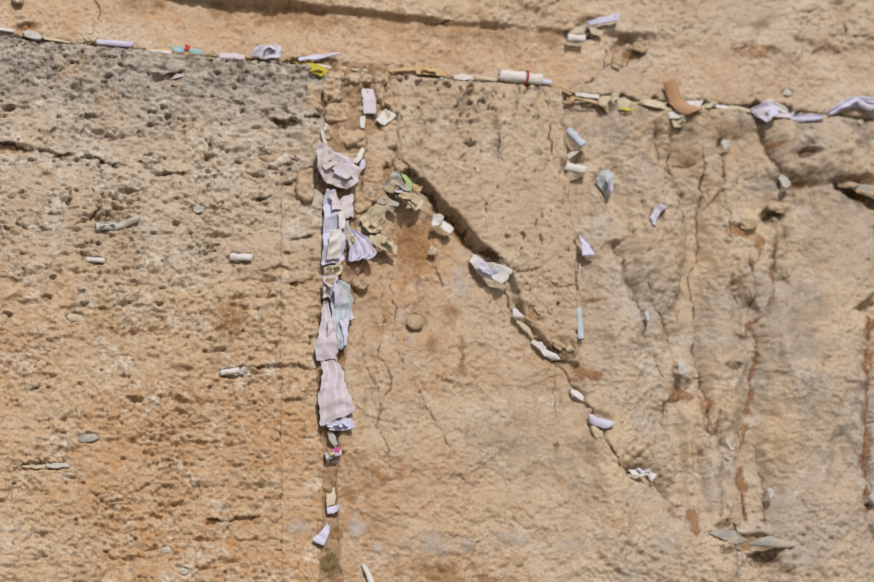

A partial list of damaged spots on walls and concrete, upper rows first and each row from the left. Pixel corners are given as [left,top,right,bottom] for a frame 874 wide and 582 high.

crack [762,137,783,173]
crack [365,283,404,451]
crack [632,127,725,438]
crack [731,236,788,396]
crack [736,429,766,524]